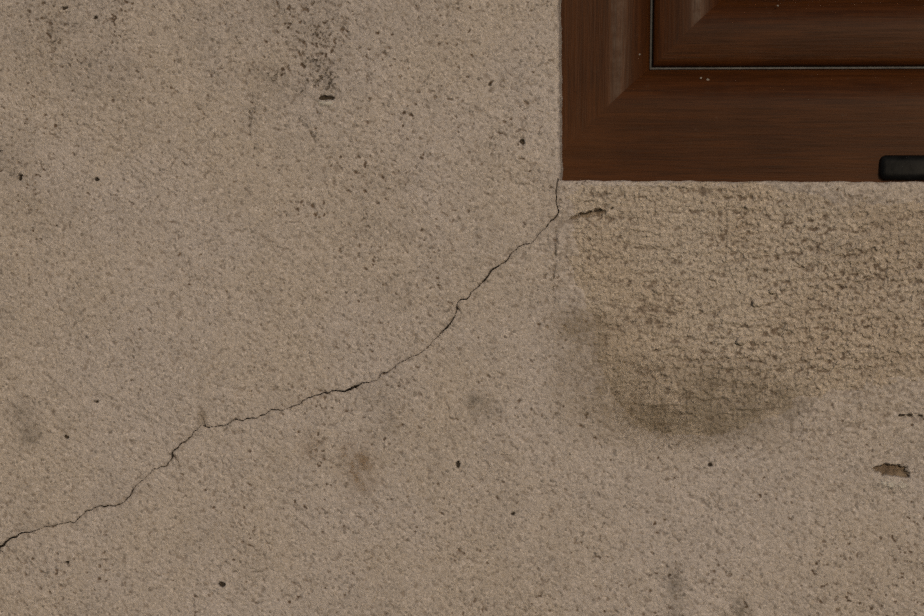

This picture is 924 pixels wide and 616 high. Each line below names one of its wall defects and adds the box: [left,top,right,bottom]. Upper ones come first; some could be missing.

crack [0,179,561,555]